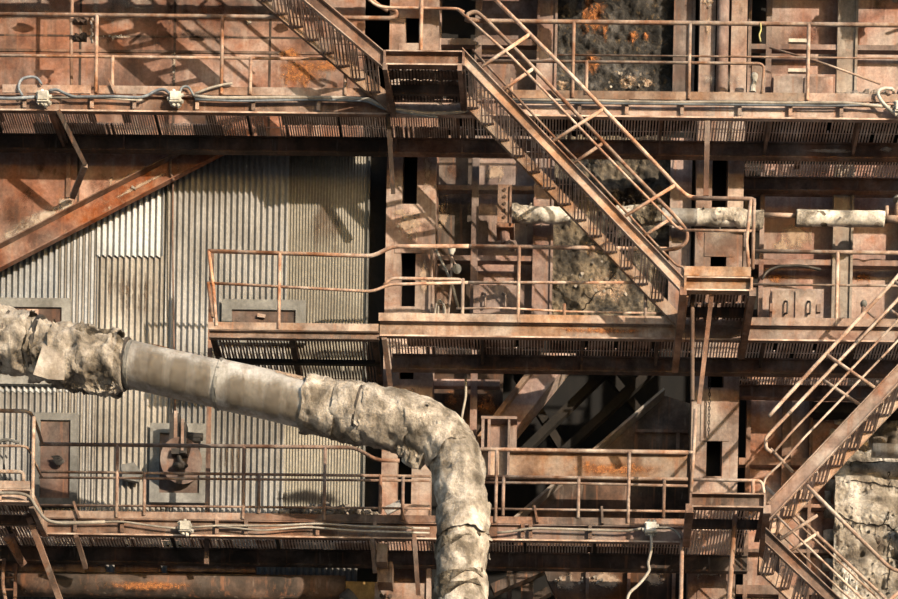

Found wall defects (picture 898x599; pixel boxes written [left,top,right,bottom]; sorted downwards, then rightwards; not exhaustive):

rust [583,2,607,37]
rust [281,48,336,87]
crack [843,460,898,490]
crack [839,511,897,593]